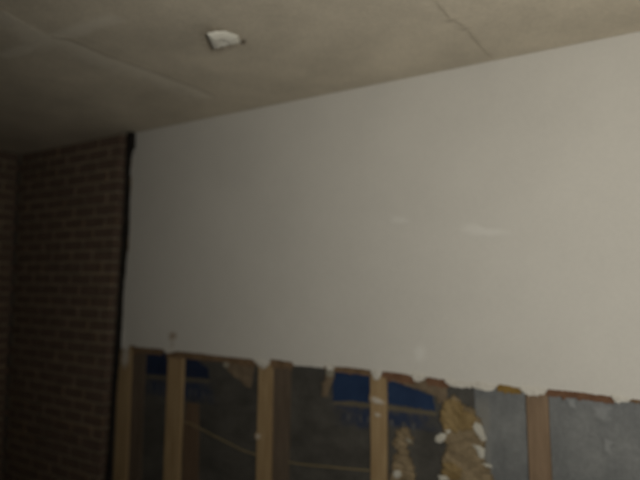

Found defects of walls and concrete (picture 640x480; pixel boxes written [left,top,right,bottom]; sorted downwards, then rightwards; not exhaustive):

peeling [121,318,294,371]
peeling [324,363,640,404]
peeling [435,398,492,468]
peeling [438,462,463,480]